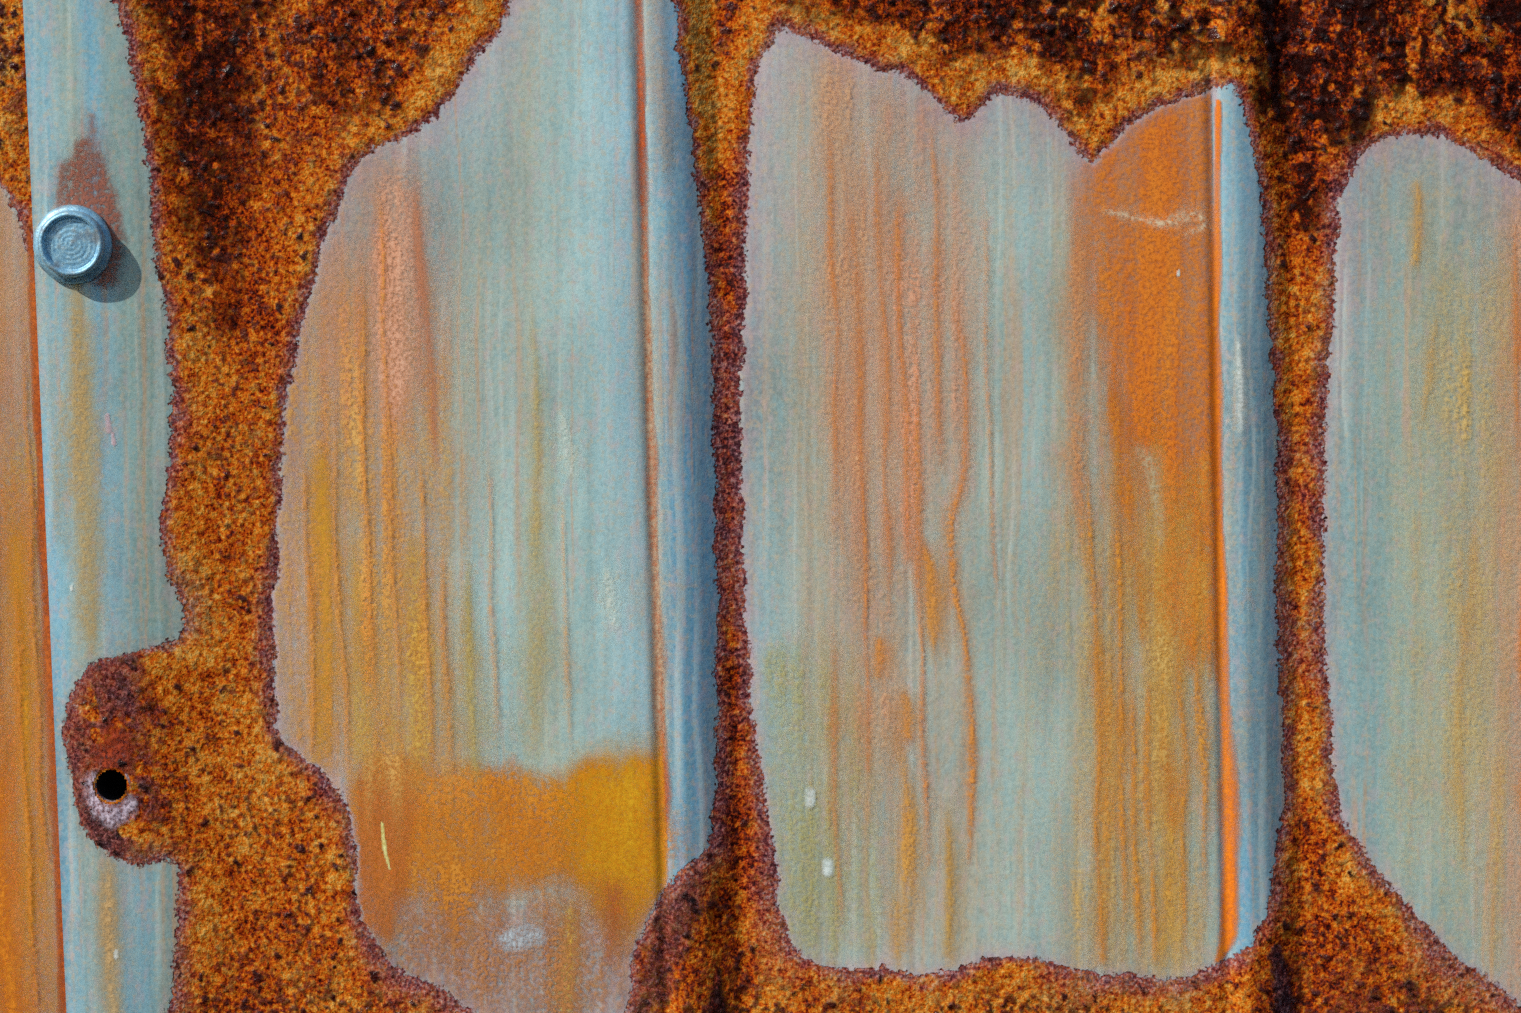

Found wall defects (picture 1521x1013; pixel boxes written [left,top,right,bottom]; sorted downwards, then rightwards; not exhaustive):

rust [142,0,275,324]
rust [830,0,1521,229]
rust [0,215,158,1013]
rust [57,119,122,638]
rust [273,0,704,1013]
rust [787,60,986,957]
rust [1066,94,1238,962]
rust [1441,326,1496,476]
rust [1444,491,1521,911]
rust [706,967,727,1013]
rust [1271,944,1294,1013]
rust [1329,980,1428,1013]